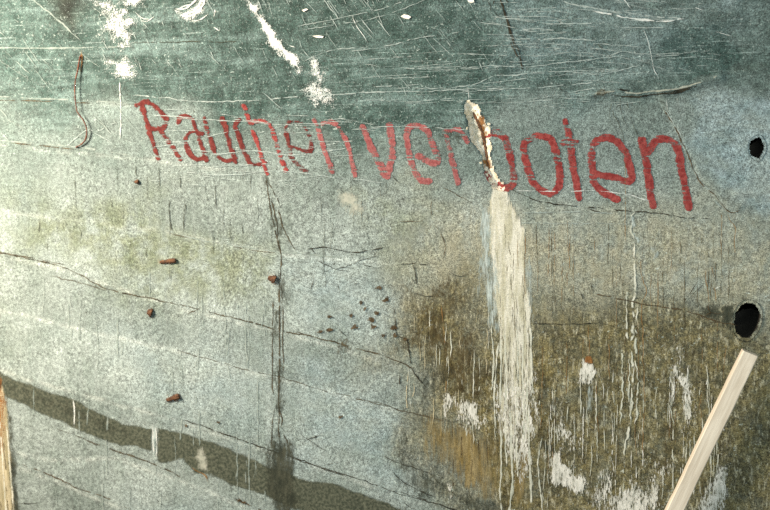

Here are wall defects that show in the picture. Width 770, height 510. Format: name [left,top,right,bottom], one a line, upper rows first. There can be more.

crack [487,0,523,67]
corrosion [0,379,19,510]
damp [0,372,400,510]
crack [307,246,383,293]
crack [386,457,435,509]
crack [390,188,470,387]
damp [406,186,695,510]
damp [667,347,712,430]